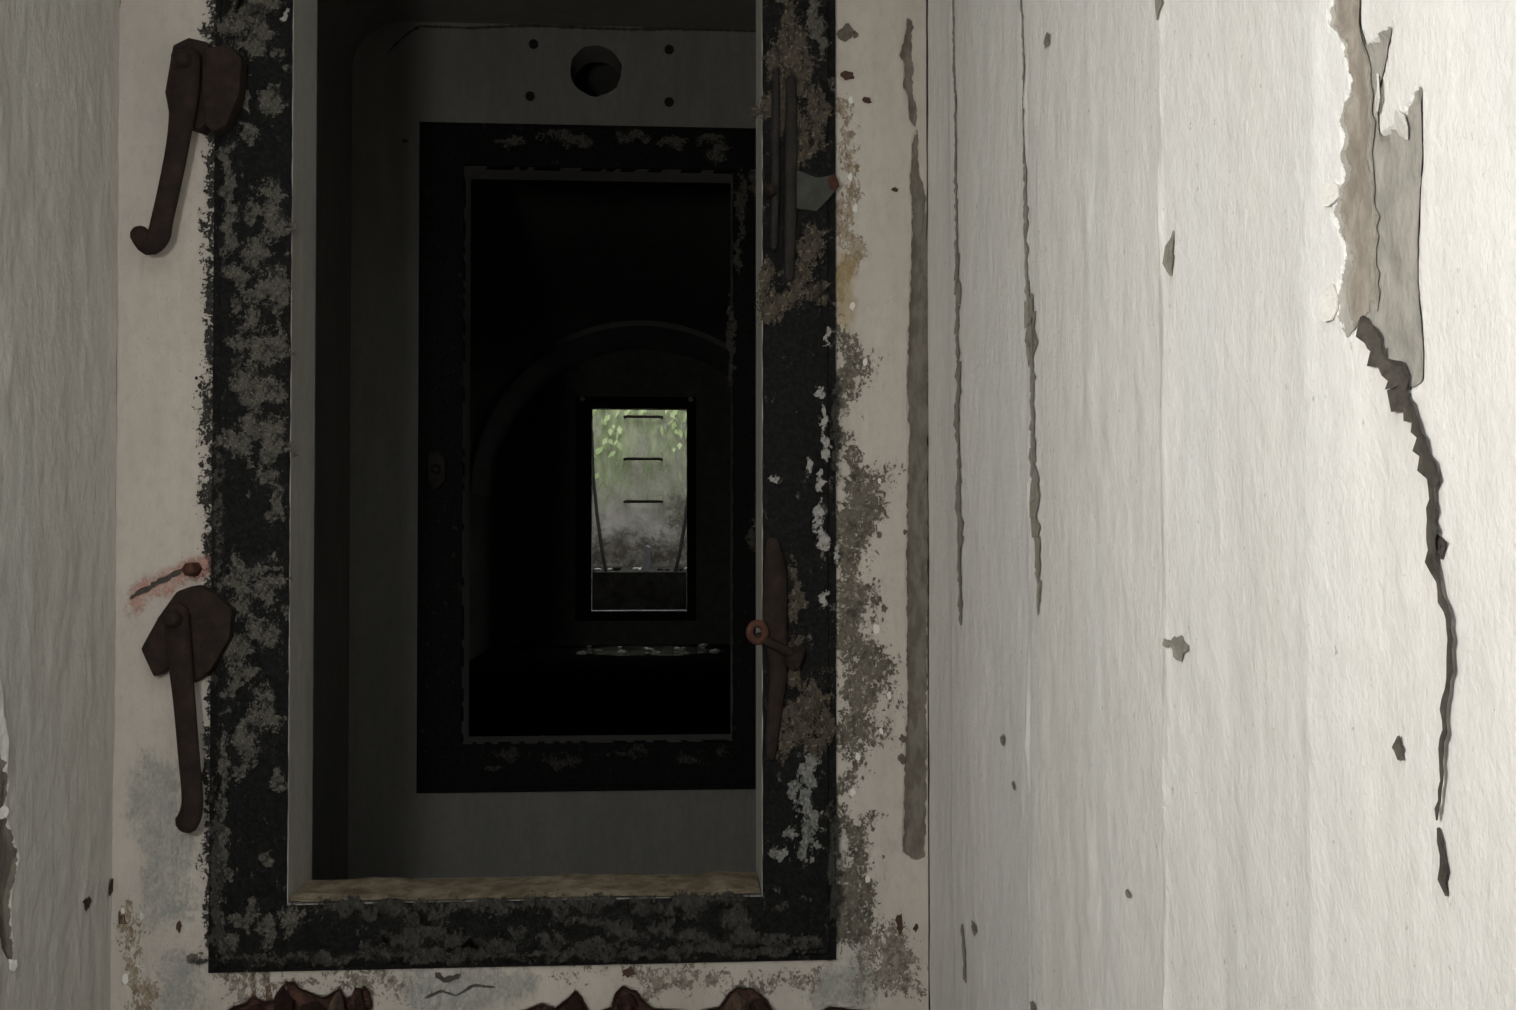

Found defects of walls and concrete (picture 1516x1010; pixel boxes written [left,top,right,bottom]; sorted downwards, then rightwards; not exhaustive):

peeling [187,0,929,1010]
crack [952,0,964,626]
crack [1020,0,1041,615]
spalling [1317,0,1424,387]
crack [1356,315,1453,896]